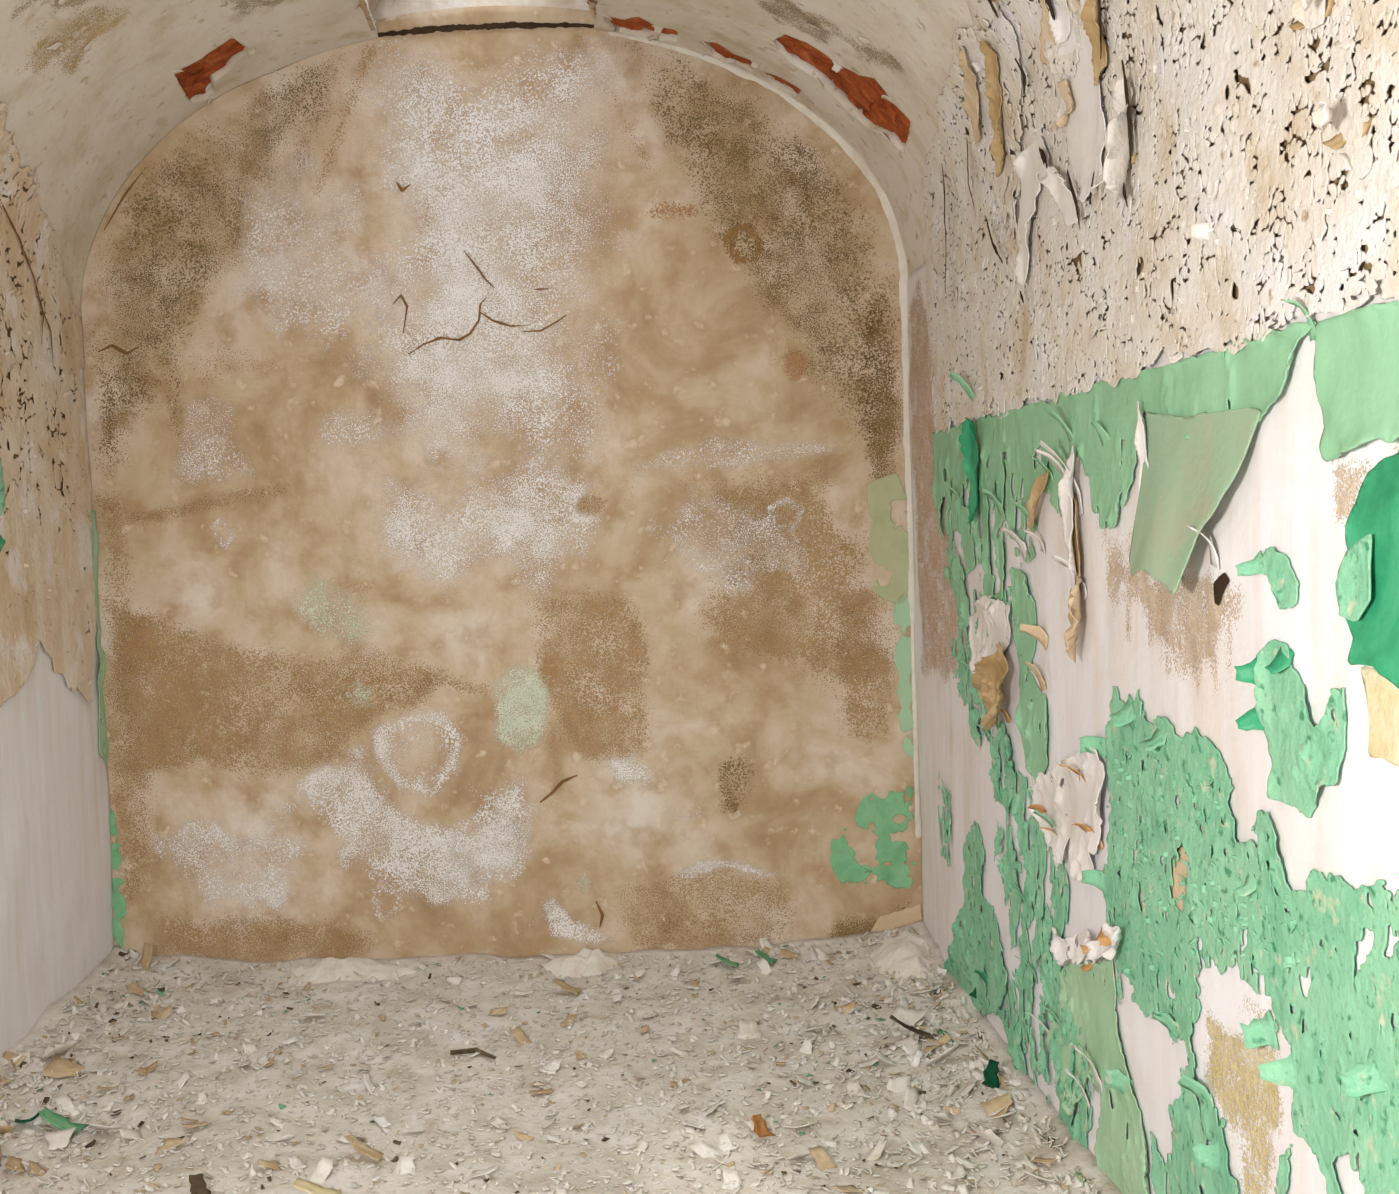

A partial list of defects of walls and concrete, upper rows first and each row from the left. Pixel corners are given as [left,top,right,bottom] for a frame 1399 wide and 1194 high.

flaking render [0,102,109,764]
crack [393,251,566,354]
water stain [85,28,904,962]
peeling [867,0,1399,1194]